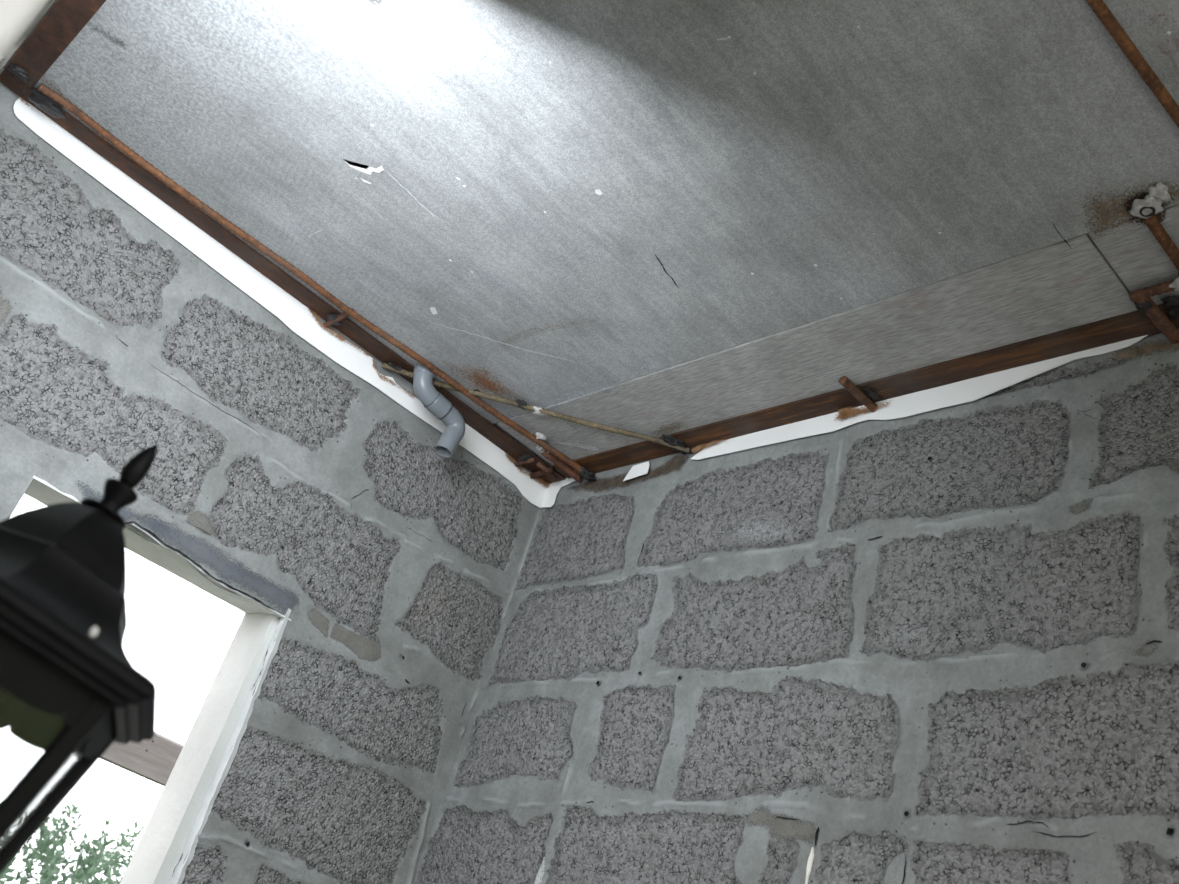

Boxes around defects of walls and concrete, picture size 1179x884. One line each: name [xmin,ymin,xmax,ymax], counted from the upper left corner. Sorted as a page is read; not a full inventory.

crack [0,0,55,69]
rust [1084,181,1179,236]
crack [1007,820,1094,837]